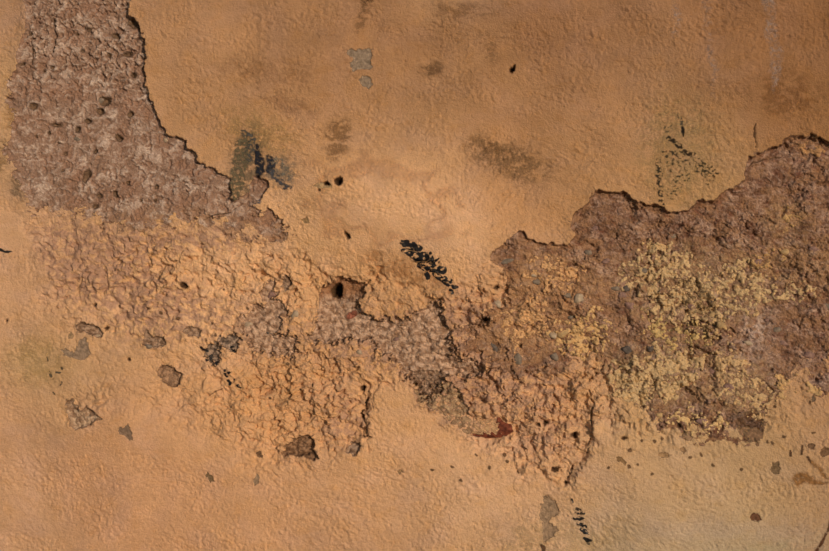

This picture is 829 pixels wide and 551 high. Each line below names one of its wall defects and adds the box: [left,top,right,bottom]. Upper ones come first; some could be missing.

peeling [346,48,373,90]
spalling [2,0,297,249]
spalling [204,135,829,456]
peeling [61,322,103,360]
spalling [142,330,166,349]
spalling [183,326,202,338]
spalling [157,365,182,387]
spalling [65,398,102,430]
peeling [118,425,133,440]
spalling [283,435,319,461]
peeling [808,443,829,457]